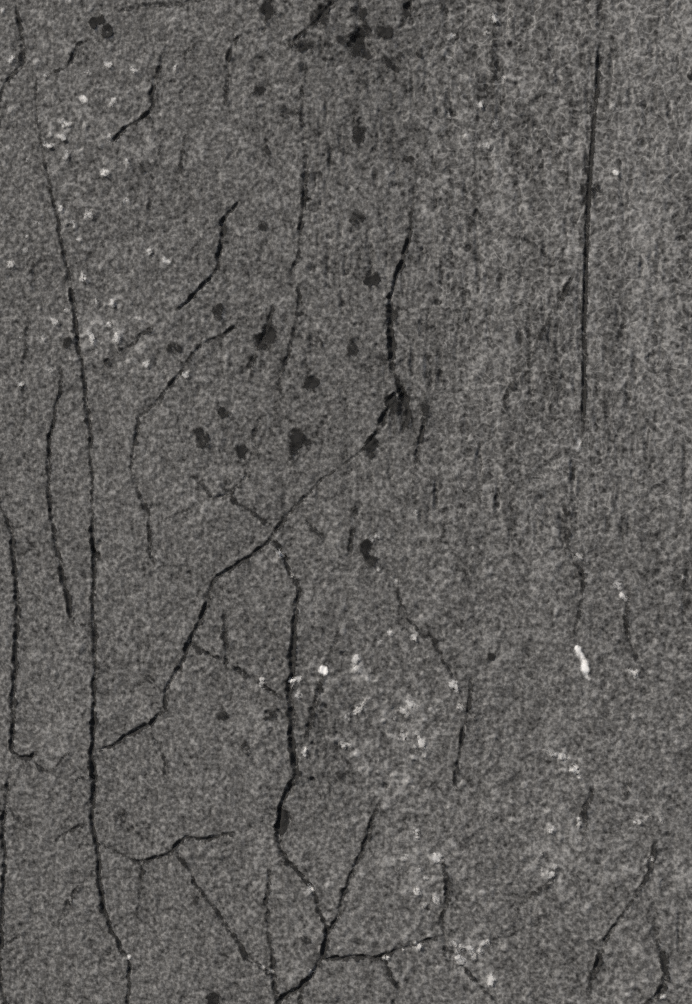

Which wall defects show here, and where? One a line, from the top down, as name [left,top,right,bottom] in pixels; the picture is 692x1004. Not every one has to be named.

crack [530,50,601,434]
crack [501,380,515,413]
crack [0,0,493,1004]
crack [562,505,587,634]
crack [622,596,644,671]
crack [579,788,594,834]
crack [531,876,558,896]
crack [586,842,657,993]
crack [644,927,670,1004]